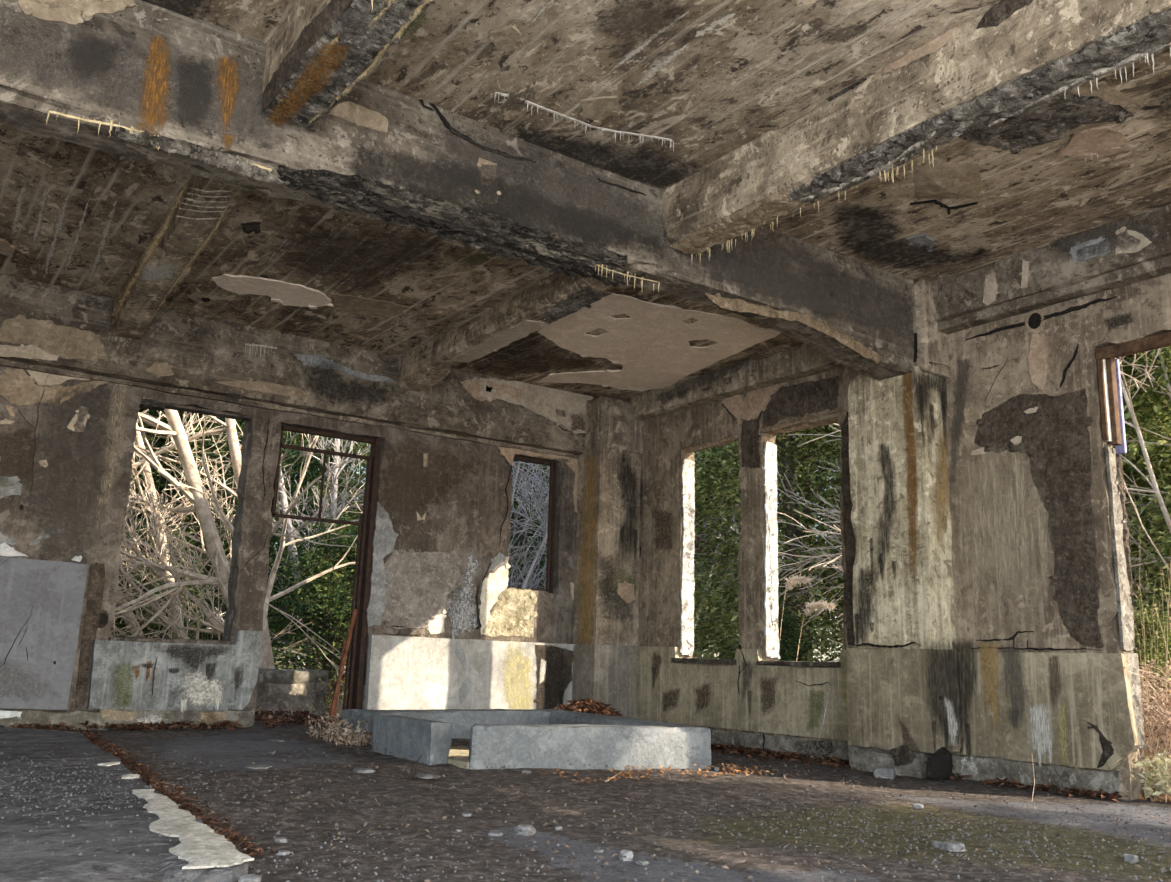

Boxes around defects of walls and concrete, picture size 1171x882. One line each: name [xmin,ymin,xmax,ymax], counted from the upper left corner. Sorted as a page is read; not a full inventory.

spalling [976,0,1033,29]
crack [419,99,537,163]
spalling [670,8,1171,254]
crack [965,296,1118,398]
damp [914,359,968,482]
peeling [0,476,22,499]
peeling [0,526,68,557]
damp [854,443,896,644]
spalling [366,501,574,709]
crack [848,641,922,649]
damp [927,453,1066,773]
crack [969,631,1094,651]